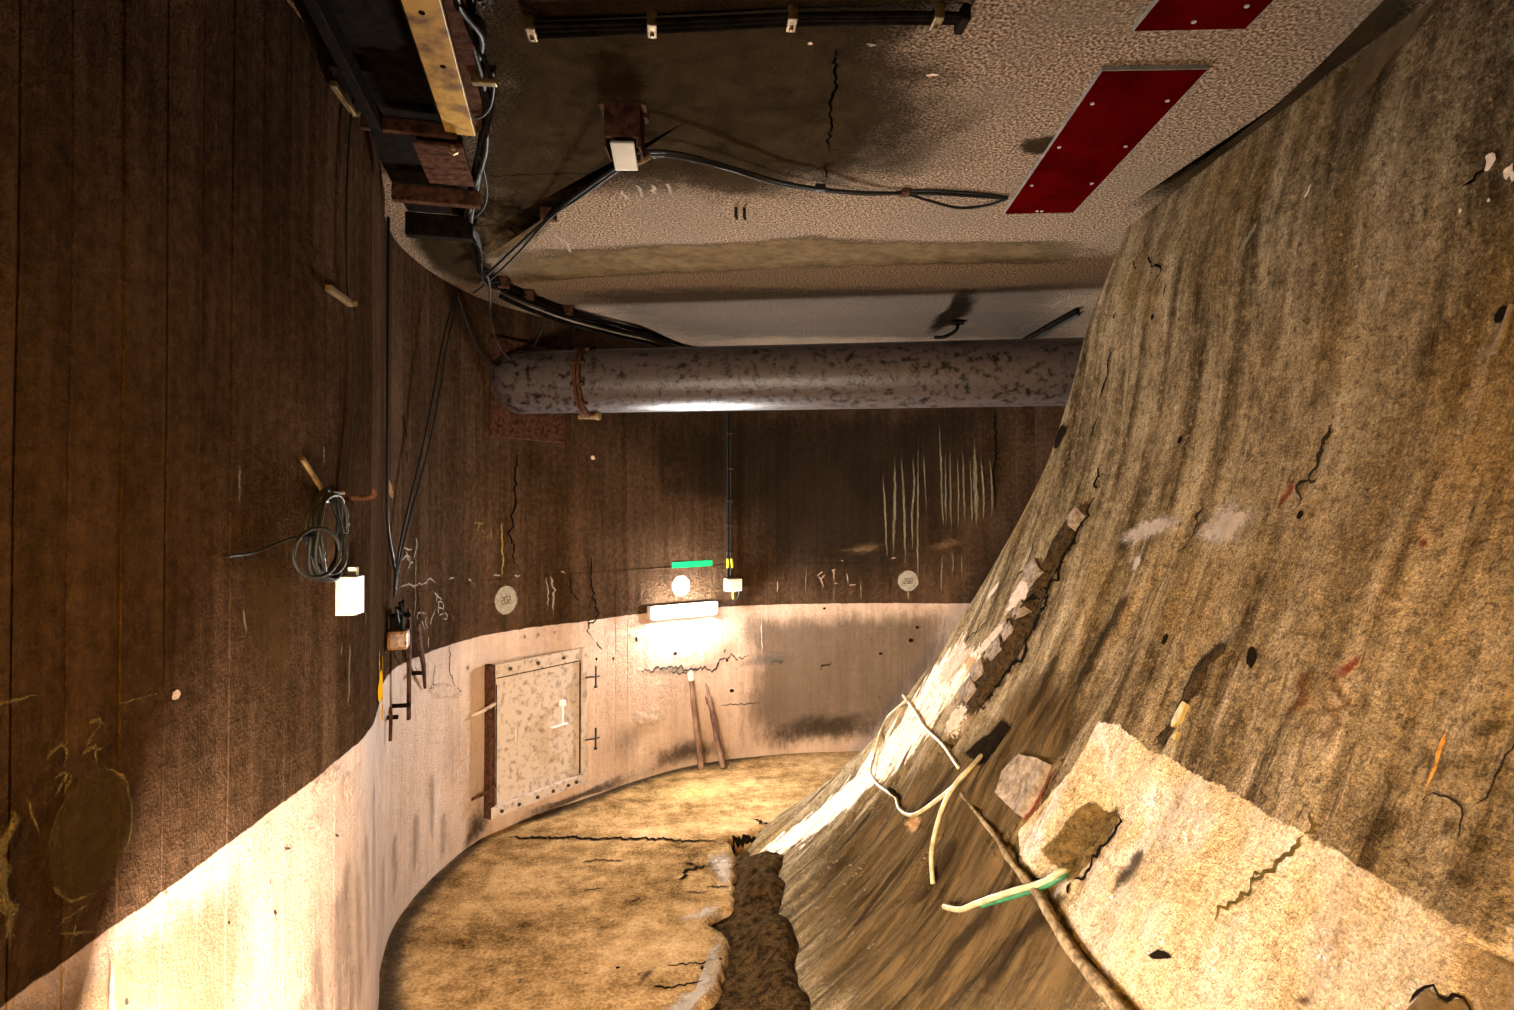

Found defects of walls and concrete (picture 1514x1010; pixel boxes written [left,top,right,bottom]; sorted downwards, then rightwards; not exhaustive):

crack [1295,424,1332,508]
crack [641,649,783,706]
spalling [937,501,1093,821]
crack [509,818,768,901]
crack [1215,813,1315,919]
peeling [1406,989,1469,1010]